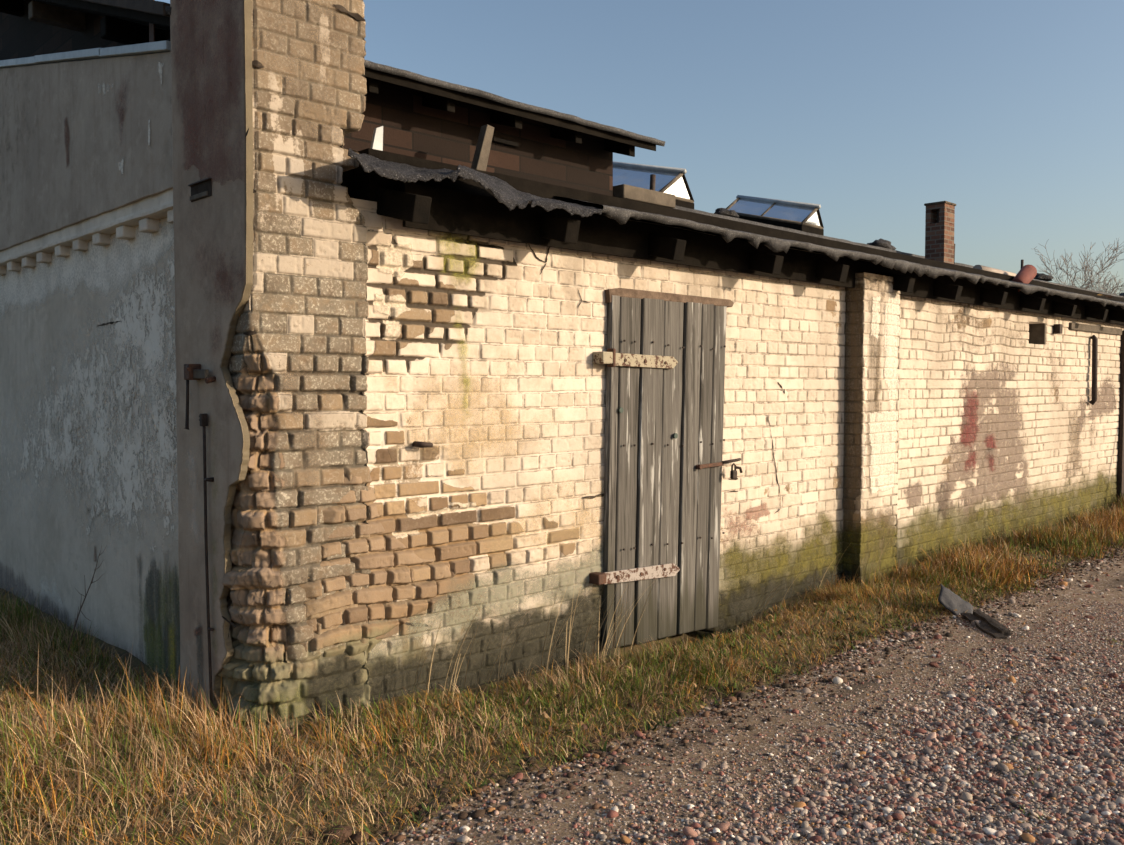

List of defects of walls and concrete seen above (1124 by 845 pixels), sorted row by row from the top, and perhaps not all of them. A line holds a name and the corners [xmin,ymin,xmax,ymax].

peeling [366,236,517,375]
peeling [0,238,178,554]
spalling [231,351,287,651]
water stain [960,392,996,471]
water stain [139,560,180,680]
water stain [244,588,611,721]